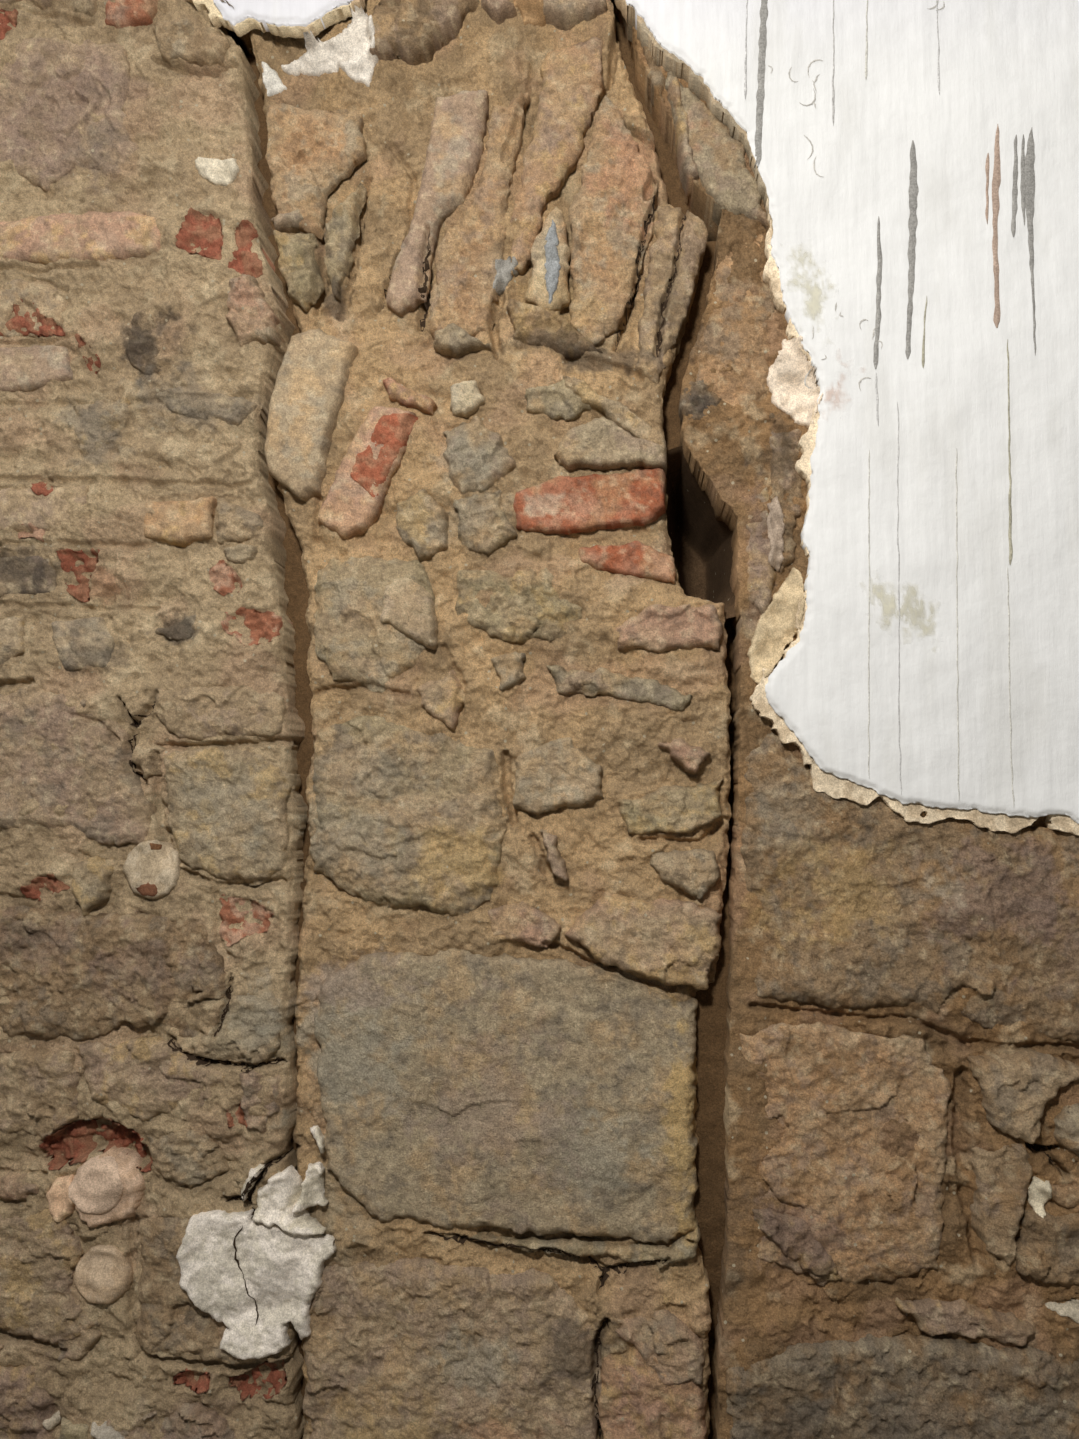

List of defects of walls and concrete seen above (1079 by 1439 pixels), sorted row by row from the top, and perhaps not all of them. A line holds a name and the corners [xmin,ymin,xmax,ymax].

spalling [0,299,101,374]
spalling [175,207,275,278]
crack [246,56,301,336]
crack [382,232,431,332]
crack [614,14,716,450]
spalling [350,413,418,497]
spalling [209,560,292,646]
crack [167,467,314,1073]
crack [429,618,735,1439]
spalling [39,1117,153,1172]
crack [225,1135,299,1325]
peeling [241,1125,329,1236]